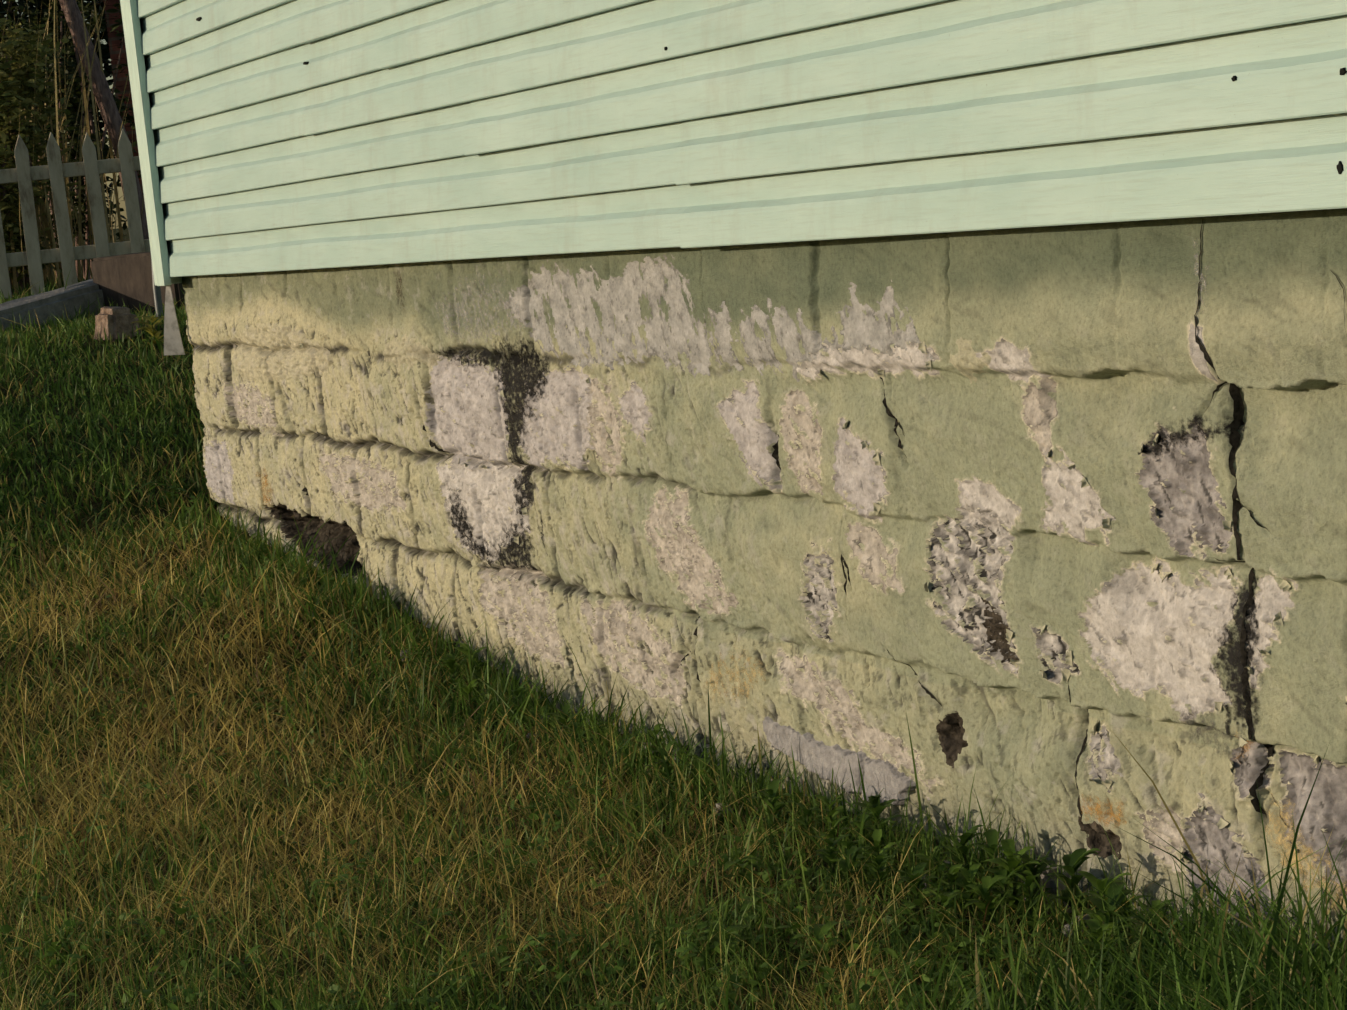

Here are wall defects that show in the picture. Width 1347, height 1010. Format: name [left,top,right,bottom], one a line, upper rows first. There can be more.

spalling [263,503,364,579]
peeling [319,445,406,512]
water stain [436,283,550,581]
peeling [424,255,940,668]
crack [880,377,906,456]
spalling [924,477,1021,674]
peeling [975,338,1116,545]
peeling [1031,423,1298,721]
crack [1194,220,1290,836]
spalling [1230,737,1347,896]